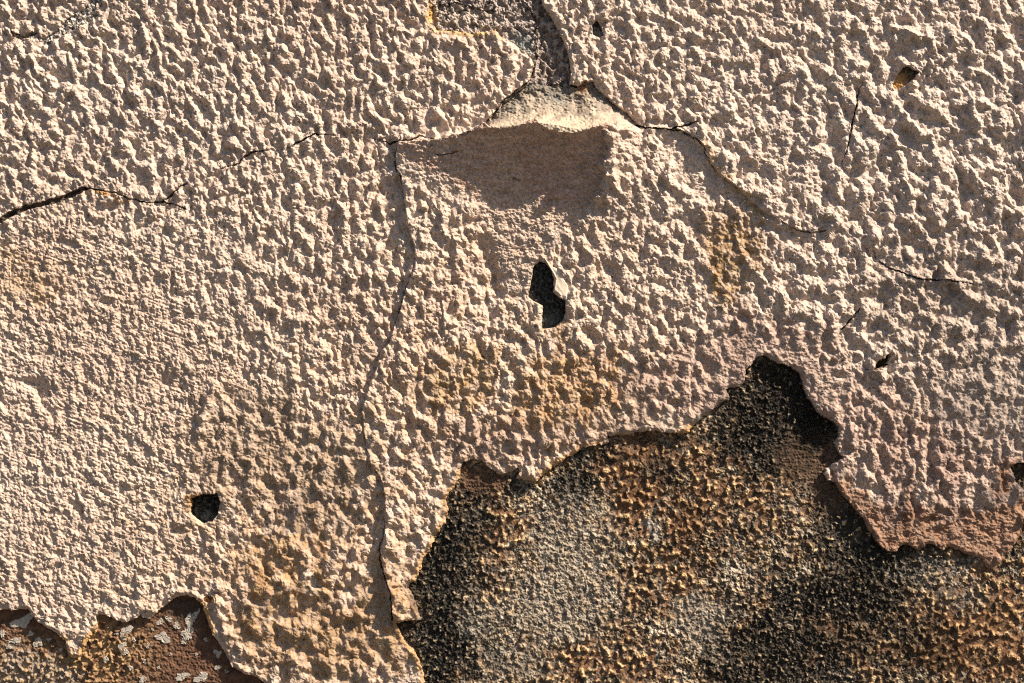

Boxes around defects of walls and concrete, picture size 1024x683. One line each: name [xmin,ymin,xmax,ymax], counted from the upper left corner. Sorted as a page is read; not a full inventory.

flaking render [425,0,637,135]
flaking render [893,67,918,89]
crack [639,121,708,153]
crack [0,184,185,223]
flaking render [525,259,568,329]
flaking render [185,492,222,528]
flaking render [397,356,1024,683]
flaking render [0,595,264,683]